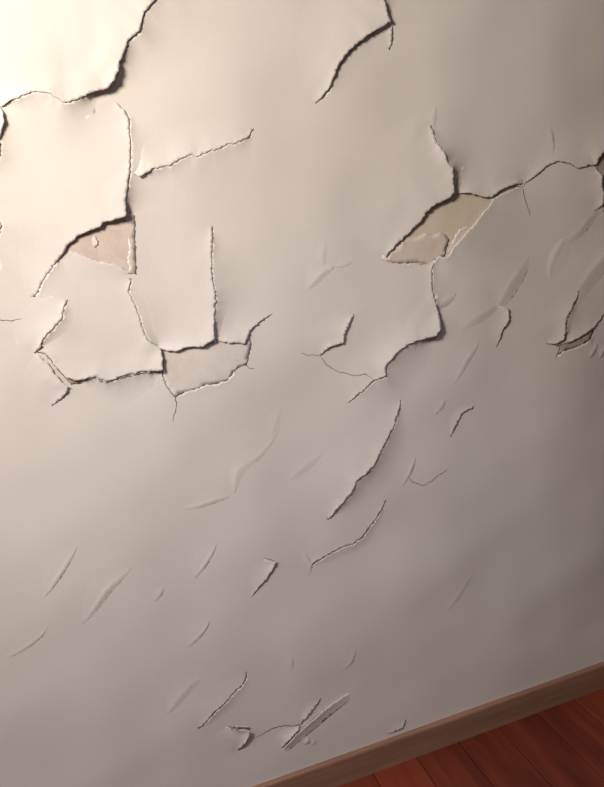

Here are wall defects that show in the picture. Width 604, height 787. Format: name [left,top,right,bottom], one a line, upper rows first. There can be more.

peeling [296,0,400,104]
peeling [0,0,272,407]
peeling [593,153,604,191]
peeling [535,225,604,357]
peeling [299,114,529,576]
peeling [248,558,277,598]
peeling [191,671,251,755]
peeling [274,693,350,751]